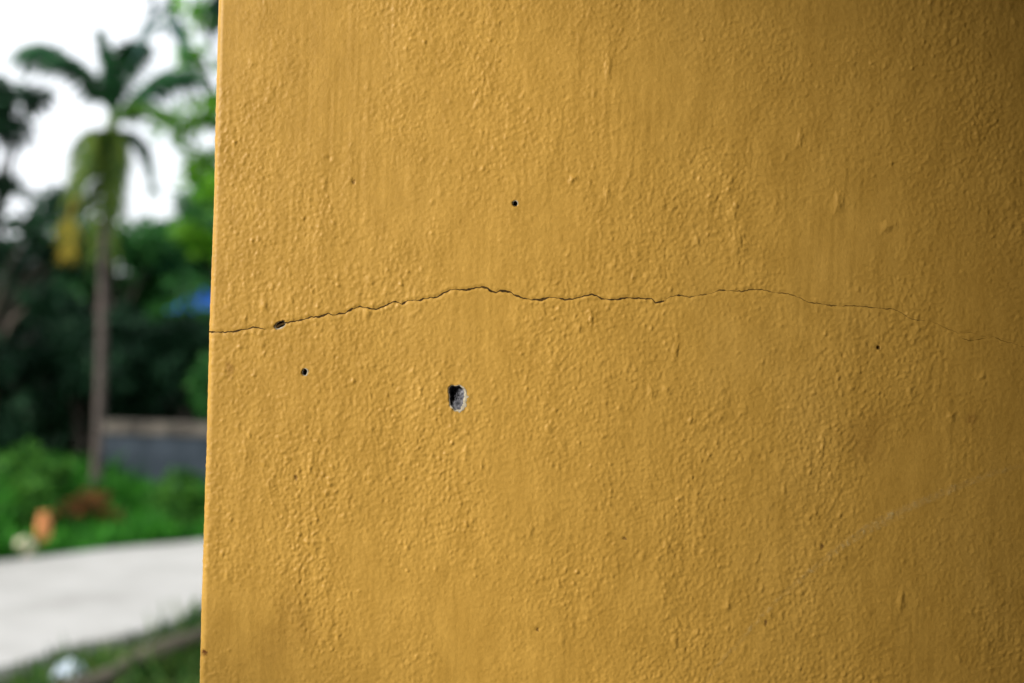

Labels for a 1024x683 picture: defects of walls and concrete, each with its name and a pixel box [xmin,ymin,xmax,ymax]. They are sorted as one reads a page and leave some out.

crack [209,286,1019,346]
spalling [449,385,469,413]